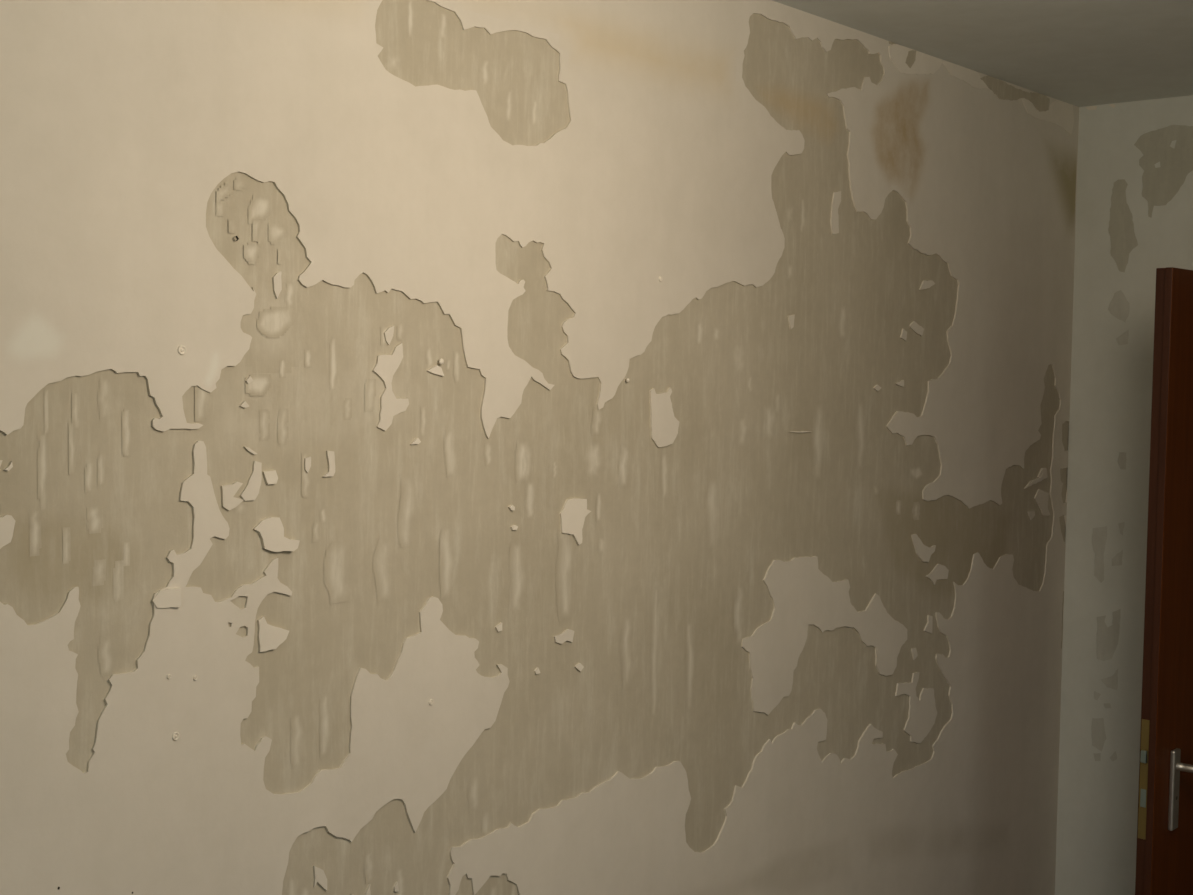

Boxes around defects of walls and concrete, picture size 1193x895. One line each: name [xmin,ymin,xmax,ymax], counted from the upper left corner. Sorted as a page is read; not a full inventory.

peeling [375,0,570,146]
peeling [742,13,884,92]
leakage [866,72,934,210]
peeling [888,44,1050,112]
peeling [1108,179,1138,272]
peeling [1134,125,1193,218]
peeling [0,72,958,895]
peeling [868,364,1060,610]